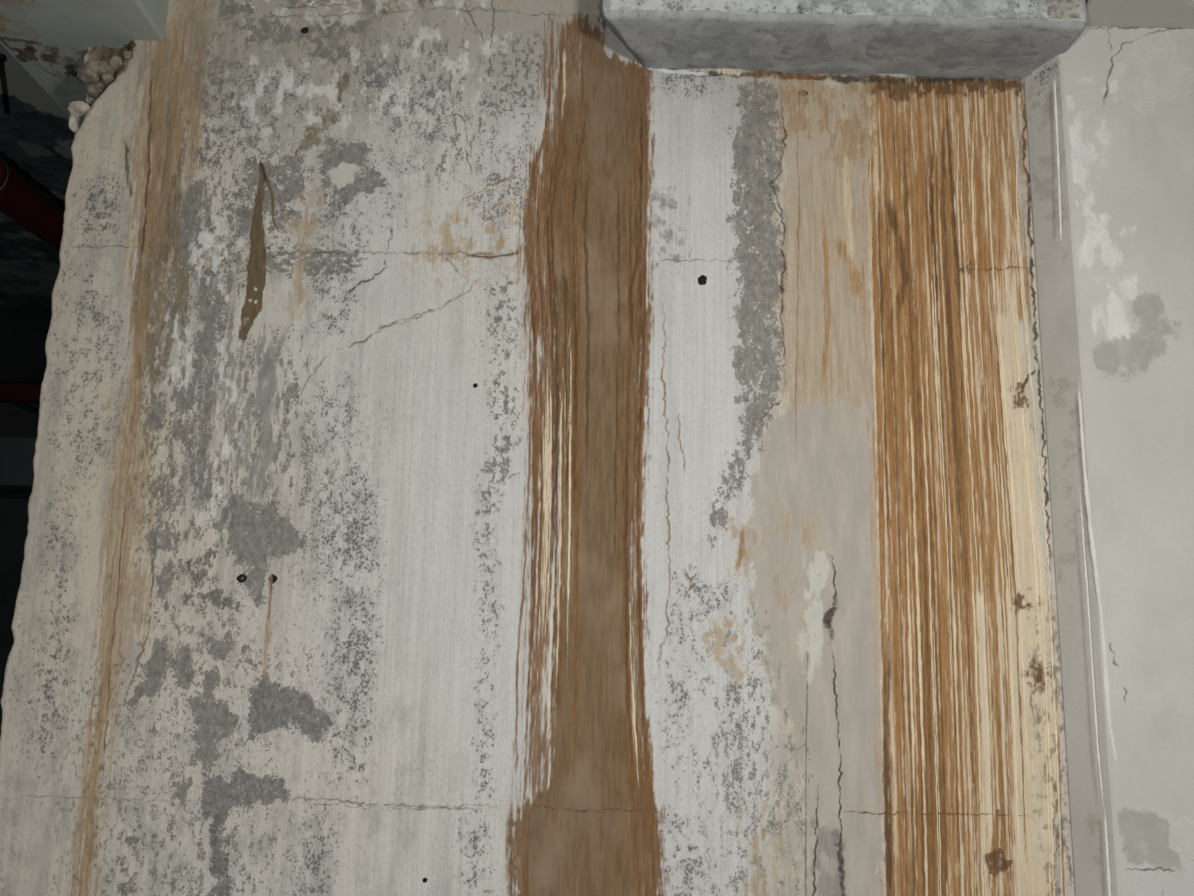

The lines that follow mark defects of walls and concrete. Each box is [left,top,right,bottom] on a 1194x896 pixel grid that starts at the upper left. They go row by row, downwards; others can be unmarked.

crack [1093,26,1183,98]
water stain [191,162,326,340]
water stain [424,200,521,274]
rust [72,0,209,896]
peeling [0,0,554,896]
rust [468,13,666,896]
rust [862,75,1065,896]
rust [263,577,272,677]
crack [1131,864,1171,872]